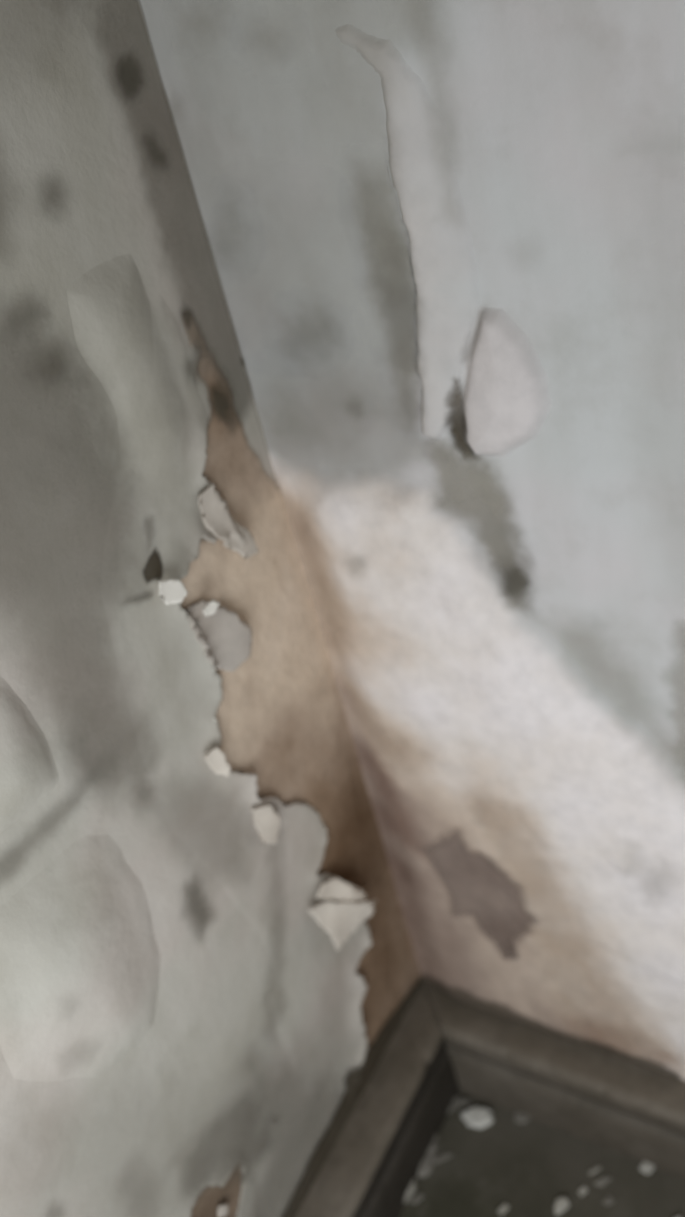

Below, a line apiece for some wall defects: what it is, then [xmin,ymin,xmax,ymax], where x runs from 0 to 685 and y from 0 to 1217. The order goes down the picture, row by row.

peeling [335,24,482,442]
spalling [101,294,423,1097]
damp [269,450,685,1081]
spalling [172,1144,260,1217]